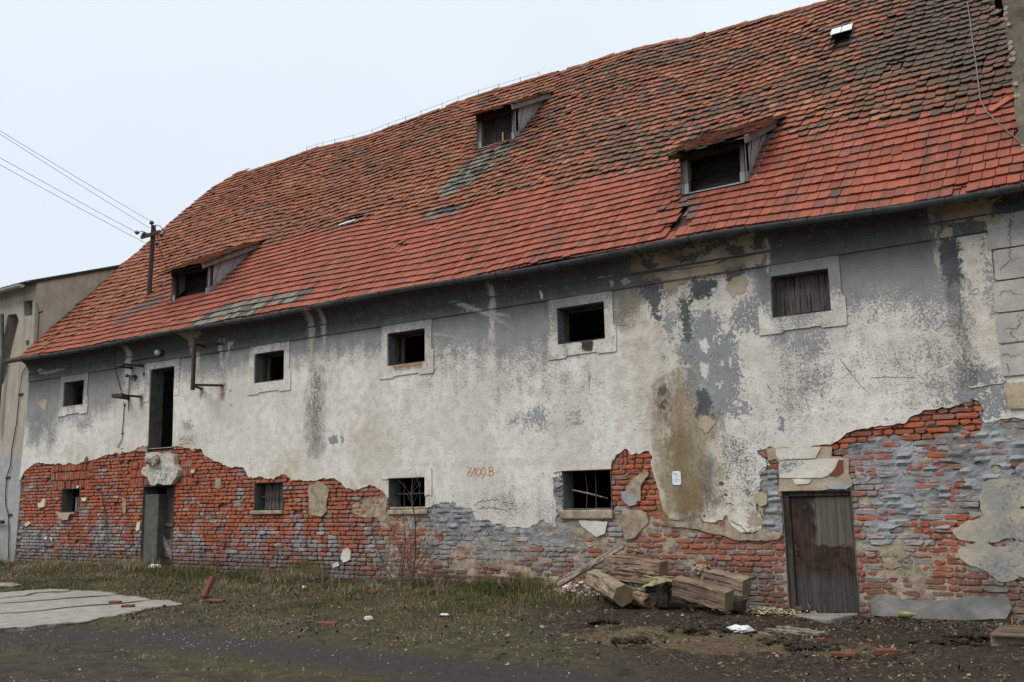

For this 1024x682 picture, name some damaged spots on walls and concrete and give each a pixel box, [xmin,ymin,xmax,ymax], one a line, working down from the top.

leakage [303,308,326,454]
flaking render [15,303,1024,622]
leakage [654,387,724,515]
peeling [599,231,830,433]
crack [970,216,1023,370]